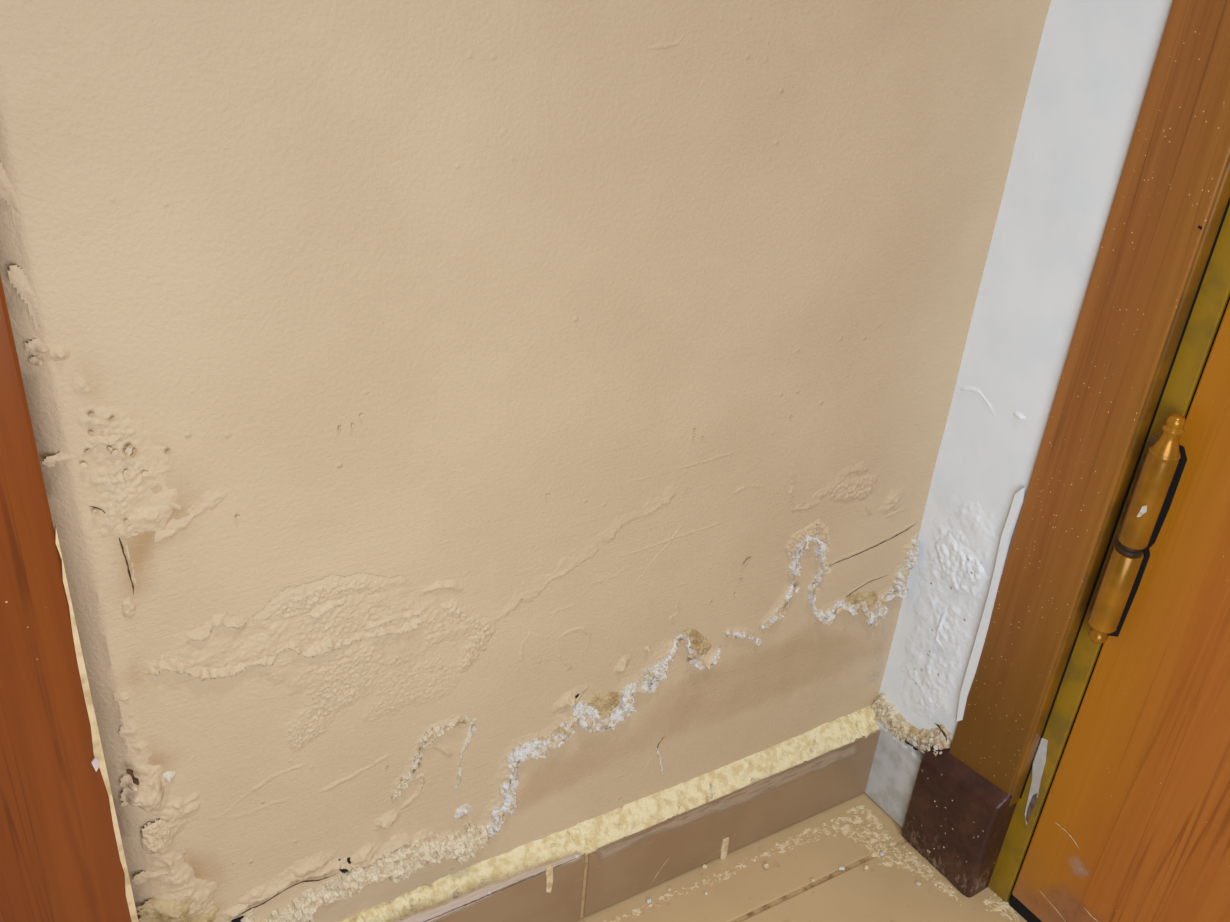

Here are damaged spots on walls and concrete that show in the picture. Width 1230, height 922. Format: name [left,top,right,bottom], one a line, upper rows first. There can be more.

peeling [66,372,243,552]
spalling [113,519,952,922]